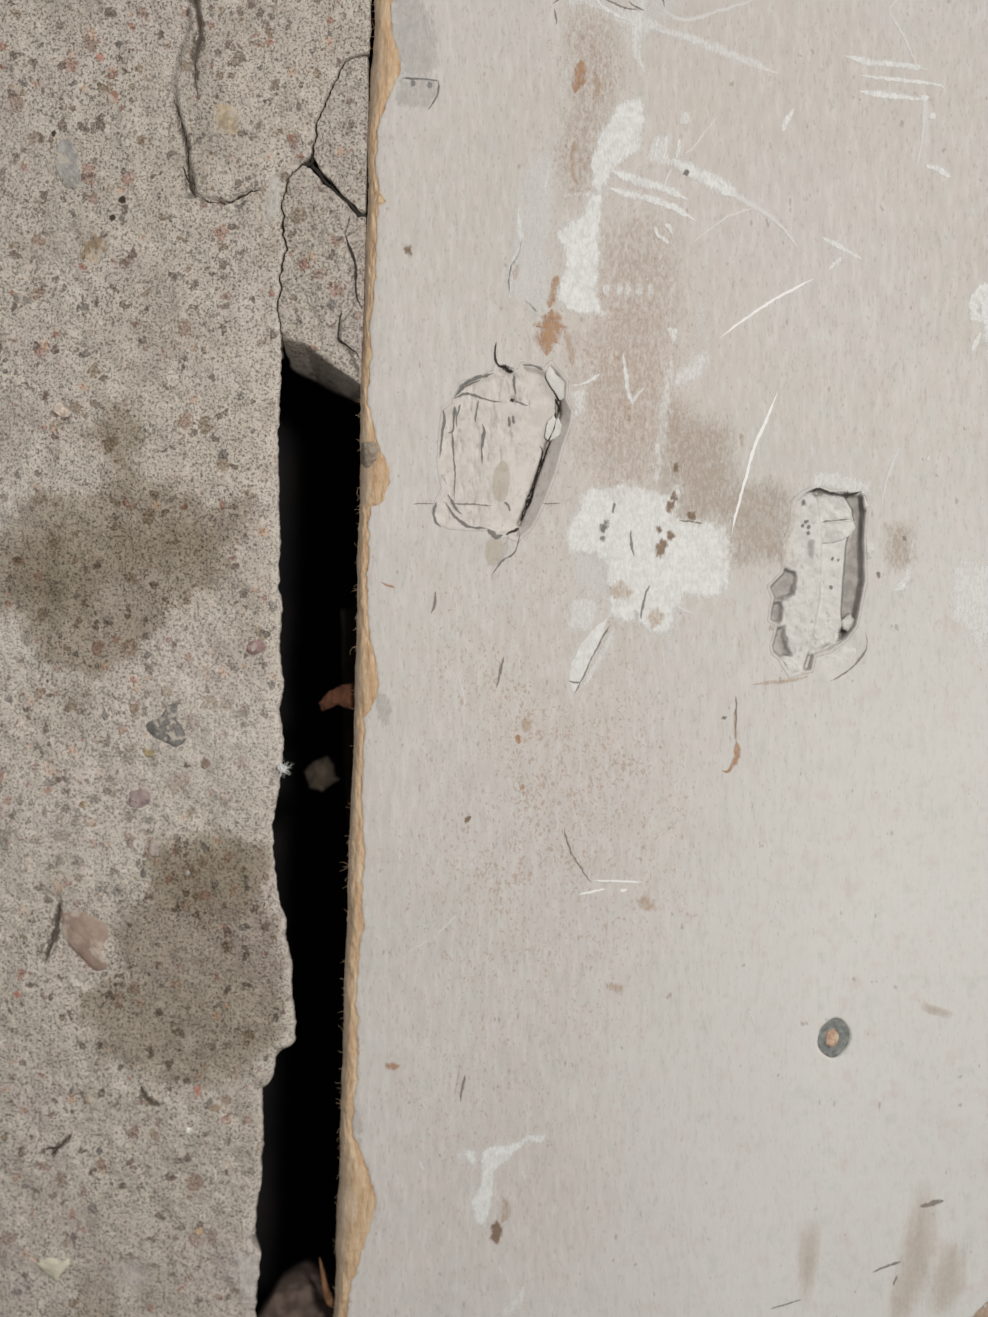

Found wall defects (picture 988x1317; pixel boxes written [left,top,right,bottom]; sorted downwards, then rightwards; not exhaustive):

crack [173,0,369,359]
spalling [767,486,875,681]